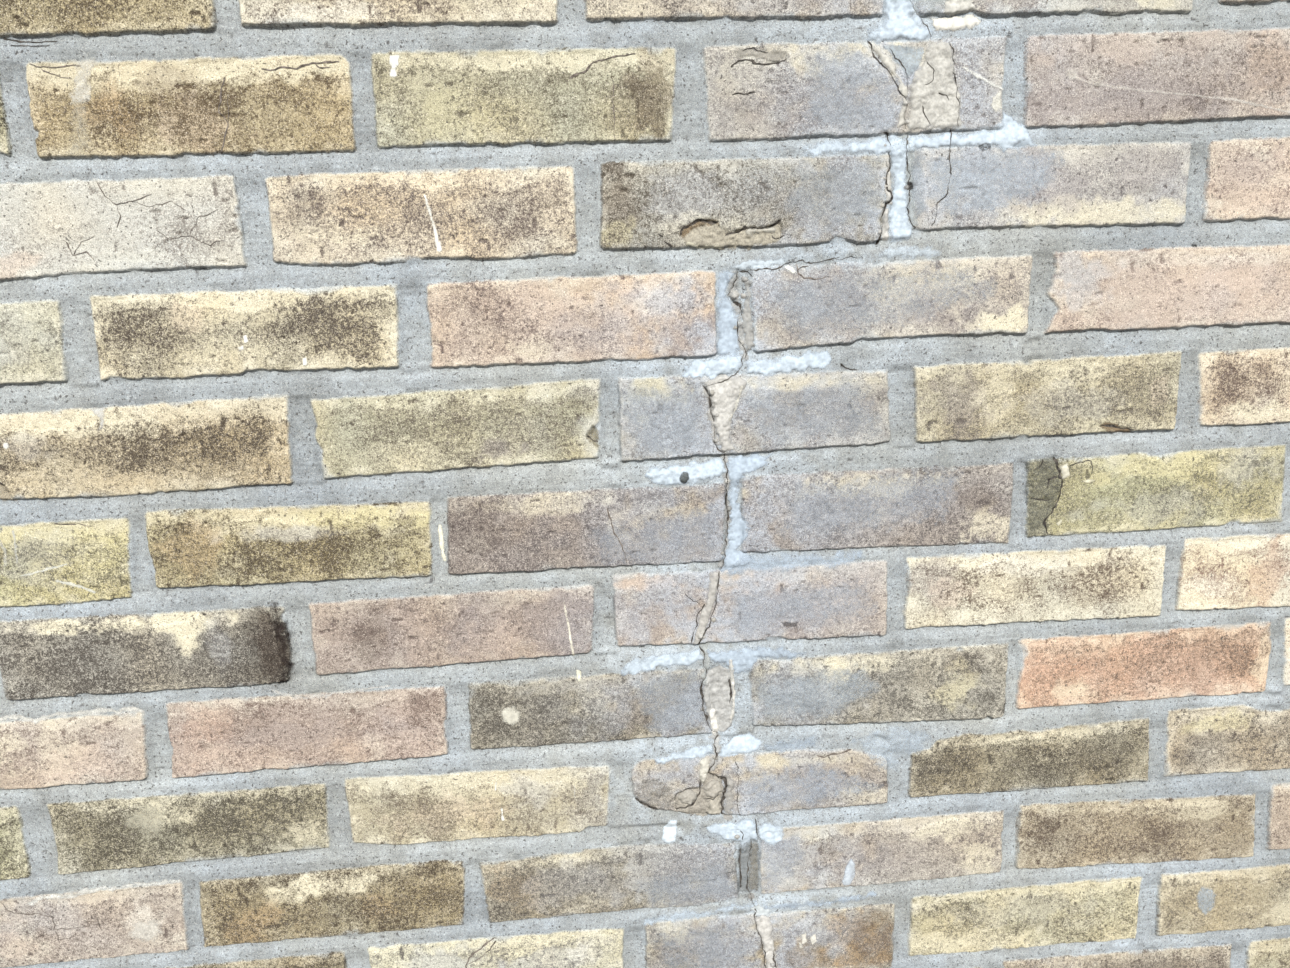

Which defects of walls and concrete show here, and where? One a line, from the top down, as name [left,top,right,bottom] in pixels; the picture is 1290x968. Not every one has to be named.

crack [686,0,960,968]